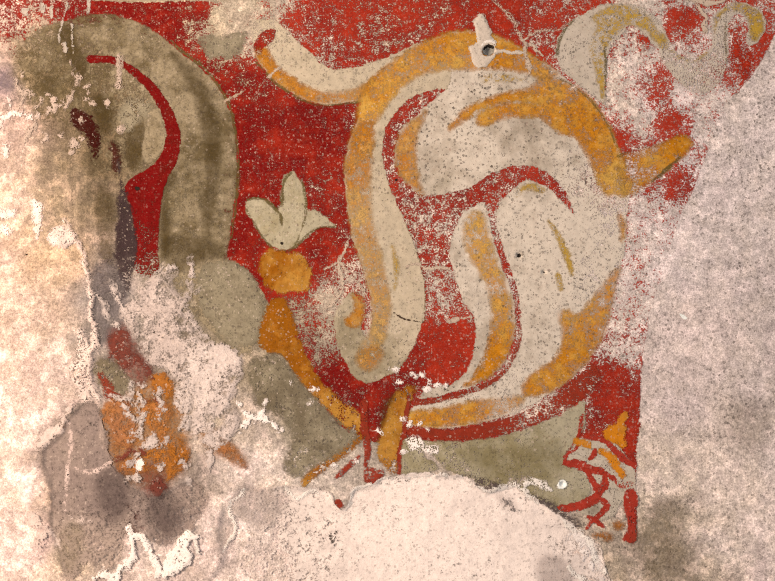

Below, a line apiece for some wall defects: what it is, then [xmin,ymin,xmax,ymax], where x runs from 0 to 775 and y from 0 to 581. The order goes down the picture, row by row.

flaking render [222,472,610,581]